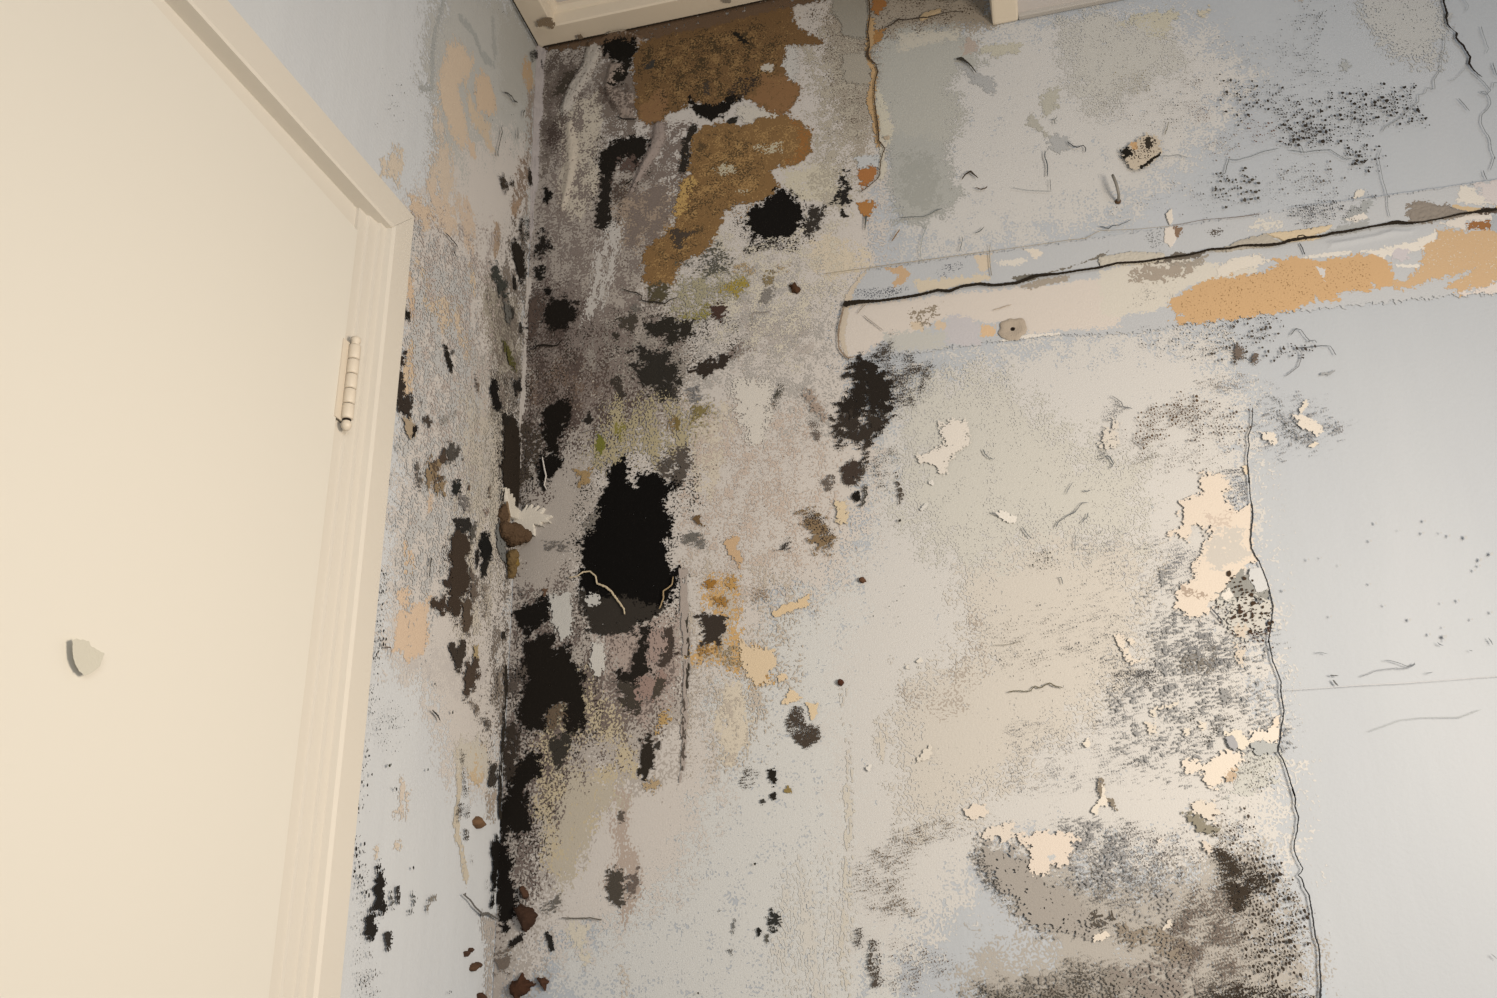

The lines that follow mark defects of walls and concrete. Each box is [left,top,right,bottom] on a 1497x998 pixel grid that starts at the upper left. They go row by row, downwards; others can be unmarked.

crack [512,0,767,48]
flaking render [631,7,823,286]
crack [825,0,1497,358]
spalling [994,179,1497,290]
crack [623,289,674,304]
peeling [1458,280,1497,296]
crack [1286,328,1336,376]
leakage [353,0,1459,998]
spalling [1214,567,1277,644]
crack [1247,408,1322,998]
peeling [1225,735,1238,751]